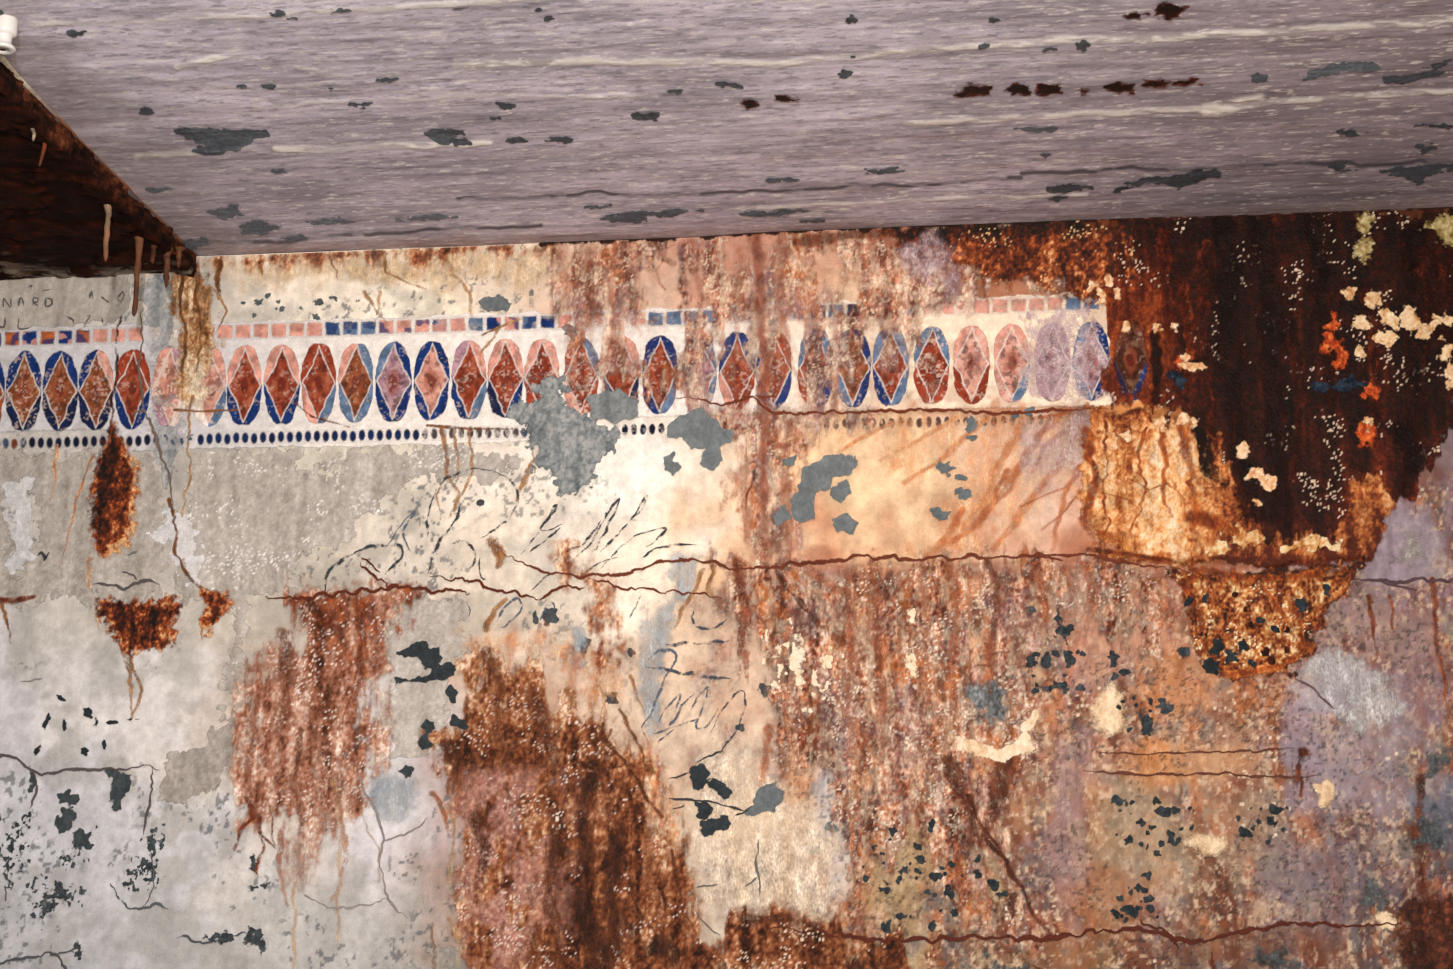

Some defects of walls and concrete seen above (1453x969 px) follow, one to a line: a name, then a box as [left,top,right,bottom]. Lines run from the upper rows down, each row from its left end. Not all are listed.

rust [0,595,35,637]
rust [64,316,183,716]
flaking render [0,274,639,805]
flaking render [663,408,734,476]
crack [265,545,1194,600]
rust [167,207,1453,969]
spalling [1166,556,1366,682]
flaking render [0,789,98,930]
flaking render [105,769,132,812]
crack [0,753,248,944]
crack [304,762,426,919]
crack [668,747,1416,969]